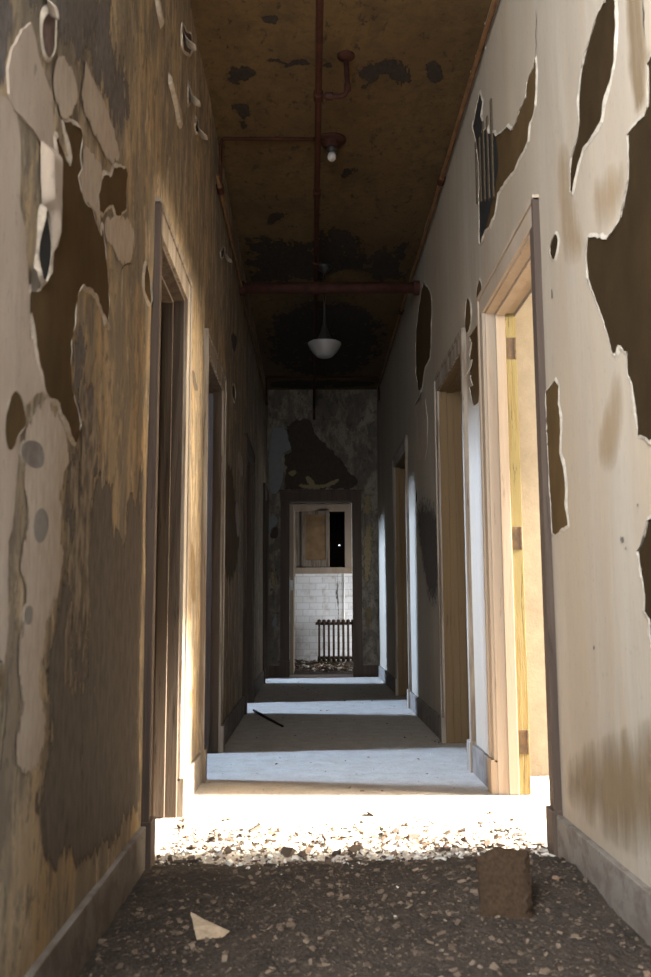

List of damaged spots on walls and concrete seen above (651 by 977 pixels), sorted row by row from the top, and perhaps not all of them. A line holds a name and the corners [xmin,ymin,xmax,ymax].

peeling [472,56,538,246]
peeling [570,0,619,196]
peeling [142,261,153,307]
damp [244,213,409,282]
peeling [585,54,651,447]
peeling [636,515,651,647]